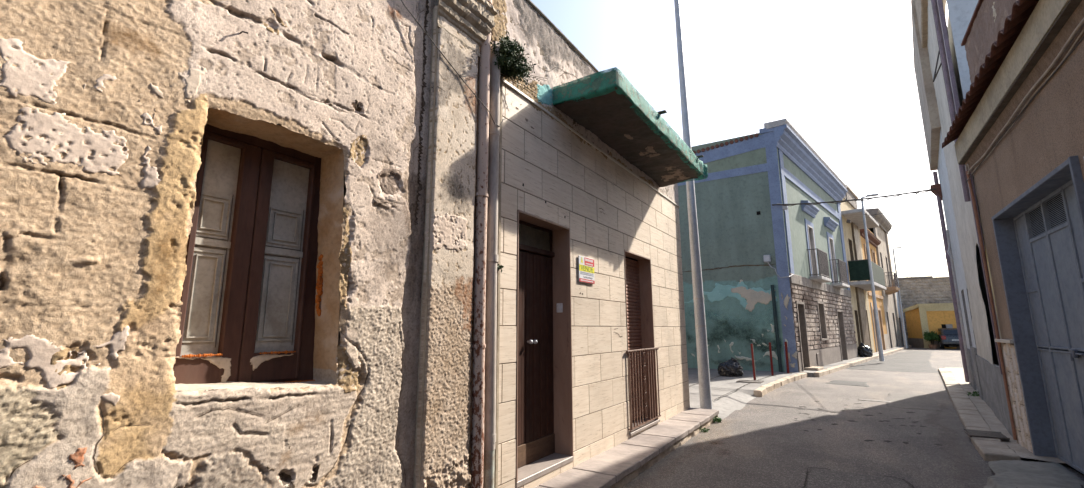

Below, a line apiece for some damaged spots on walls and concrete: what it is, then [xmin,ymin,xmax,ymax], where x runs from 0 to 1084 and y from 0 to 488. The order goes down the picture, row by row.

peeling [0,38,129,176]
peeling [139,99,162,135]
peeling [140,145,161,189]
peeling [0,326,129,390]
peeling [175,356,231,382]
peeling [250,353,294,371]
peeling [101,392,120,406]
spalling [267,466,295,488]